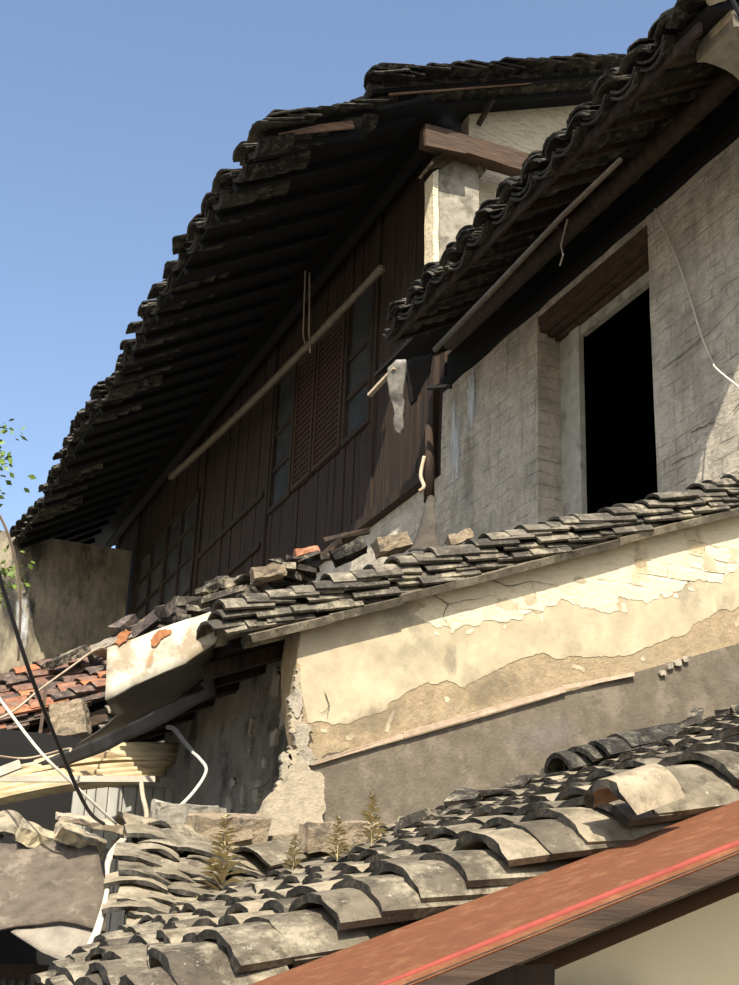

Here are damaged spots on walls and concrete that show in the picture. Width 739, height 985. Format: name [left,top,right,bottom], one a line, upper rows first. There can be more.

crack [672,404,739,465]
peeling [224,515,739,814]